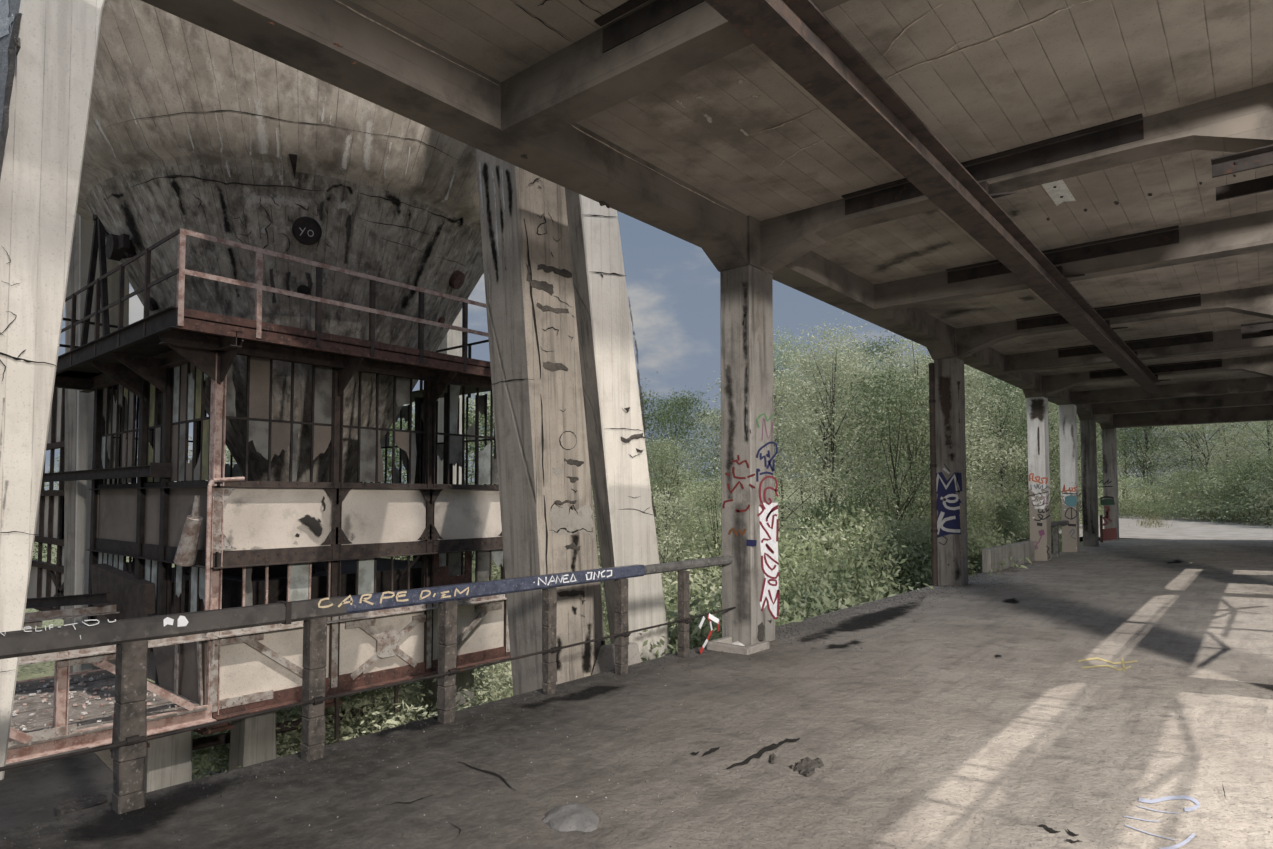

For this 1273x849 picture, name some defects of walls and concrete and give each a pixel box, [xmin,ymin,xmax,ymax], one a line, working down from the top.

spalling [0,0,22,178]
crack [107,110,458,160]
crack [132,175,330,253]
crack [360,193,464,266]
leakage [479,162,512,302]
crack [0,246,57,381]
crack [691,738,800,769]